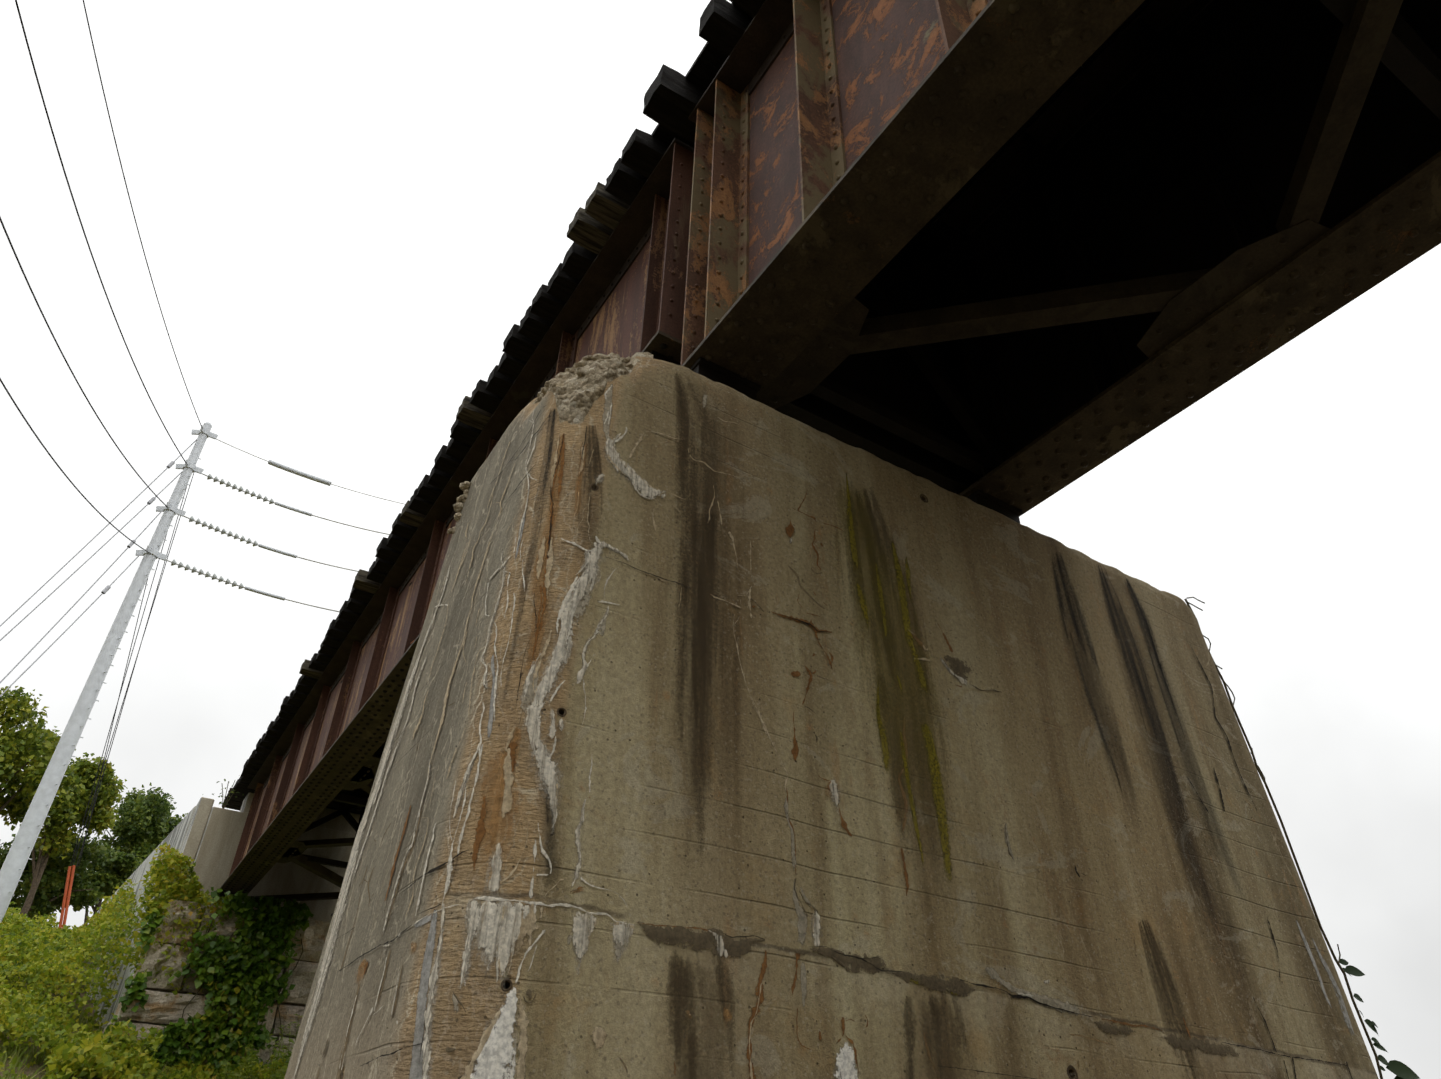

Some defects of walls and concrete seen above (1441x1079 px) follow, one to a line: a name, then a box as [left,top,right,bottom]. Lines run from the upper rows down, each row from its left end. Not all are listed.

rust [551,433,585,498]
spalling [533,352,653,446]
rust [531,537,554,661]
damp [293,536,635,1079]
rust [472,726,518,870]
crack [331,405,903,1079]
damp [922,726,952,879]
efflorescence [834,1015,868,1079]